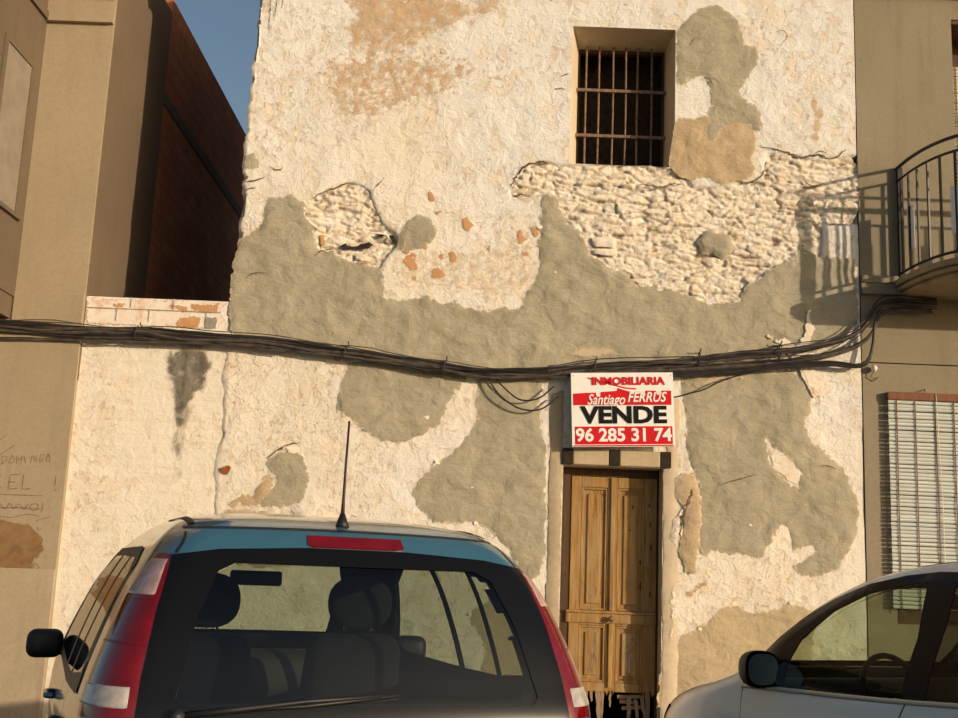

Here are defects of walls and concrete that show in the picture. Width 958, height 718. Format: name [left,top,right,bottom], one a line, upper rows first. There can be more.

spalling [305,184,543,293]
spalling [512,116,859,306]
water stain [168,350,212,451]
peeling [221,442,310,514]
peeling [0,520,43,569]
peeling [670,472,706,596]